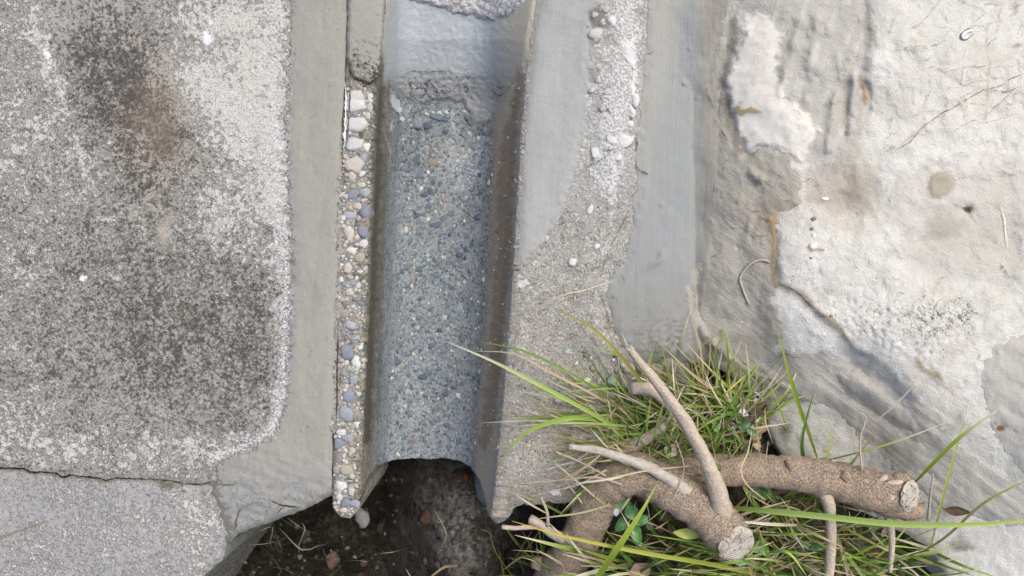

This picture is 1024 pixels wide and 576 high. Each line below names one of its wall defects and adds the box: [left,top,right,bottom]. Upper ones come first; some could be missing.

leakage [930,173,955,197]
crack [773,285,848,339]
crack [4,467,296,531]